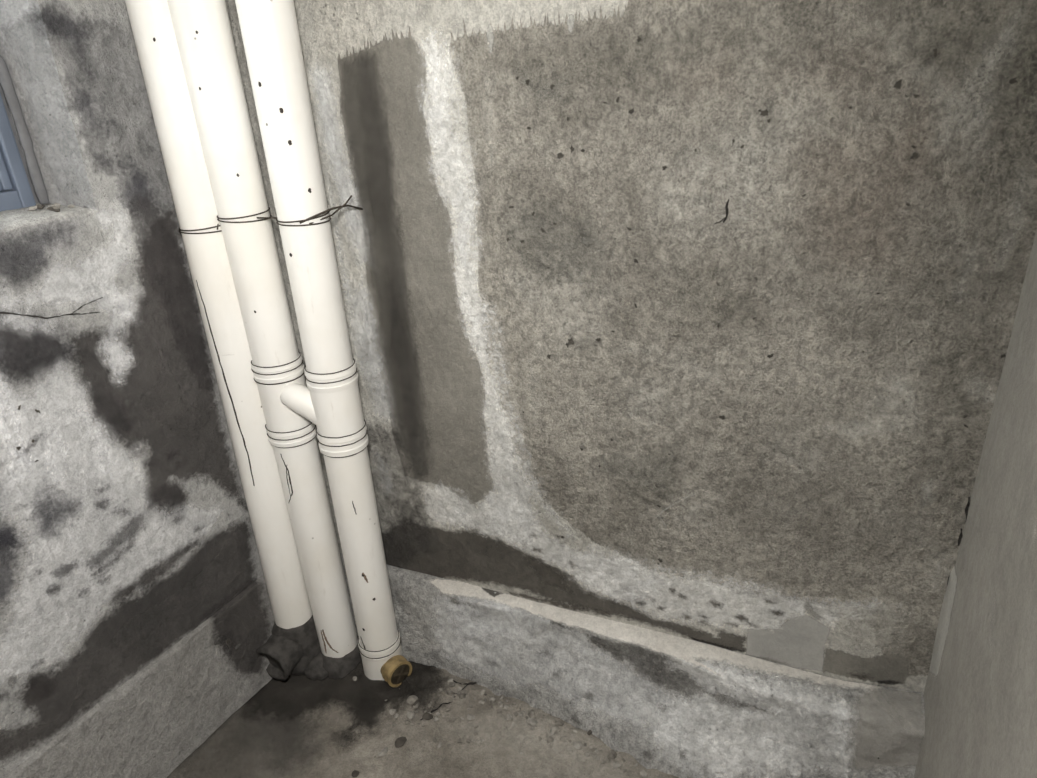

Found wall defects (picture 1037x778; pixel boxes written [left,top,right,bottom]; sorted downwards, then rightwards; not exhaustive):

water stain [39,11,78,37]
crack [0,297,103,319]
water stain [338,0,1037,778]
water stain [0,173,270,760]
water stain [244,636,446,741]